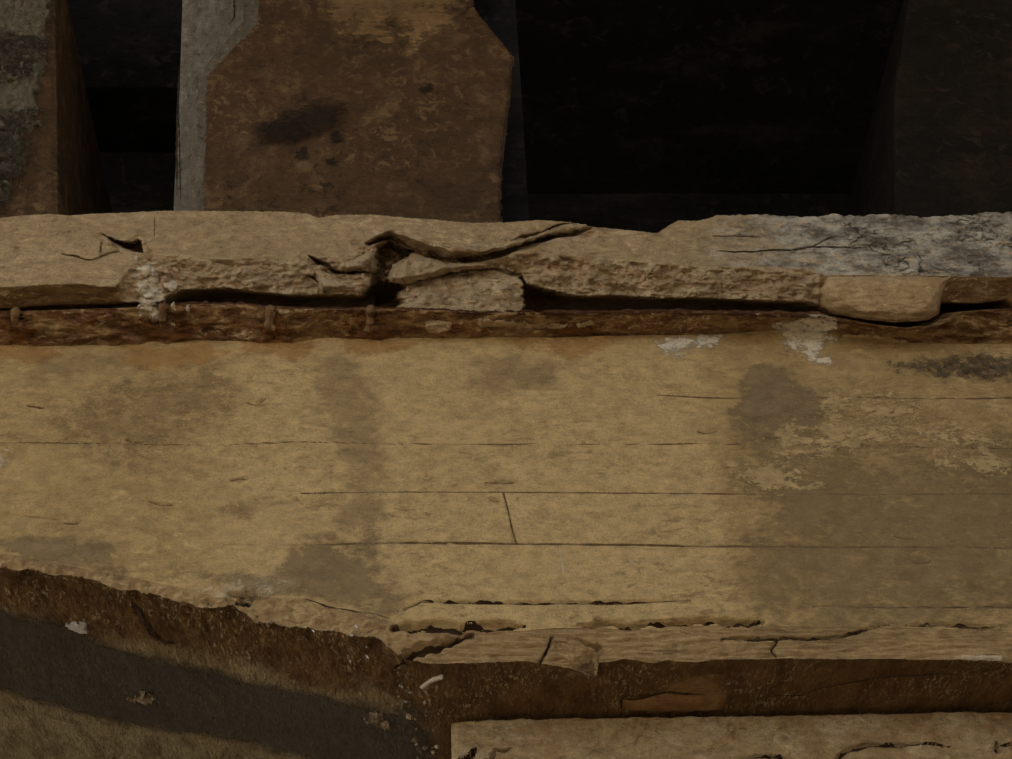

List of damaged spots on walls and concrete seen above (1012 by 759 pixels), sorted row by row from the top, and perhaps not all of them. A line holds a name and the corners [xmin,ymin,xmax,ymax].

crack [62,217,155,260]
crack [308,258,373,280]
crack [372,223,573,287]
peeling [168,222,826,318]
corrosion [0,321,39,346]
corrosion [138,314,189,344]
corrosion [349,313,395,341]
corrosion [551,321,598,338]
peeling [722,387,1012,496]
damp [728,364,1012,629]
peeling [623,691,726,712]
crack [838,742,952,759]